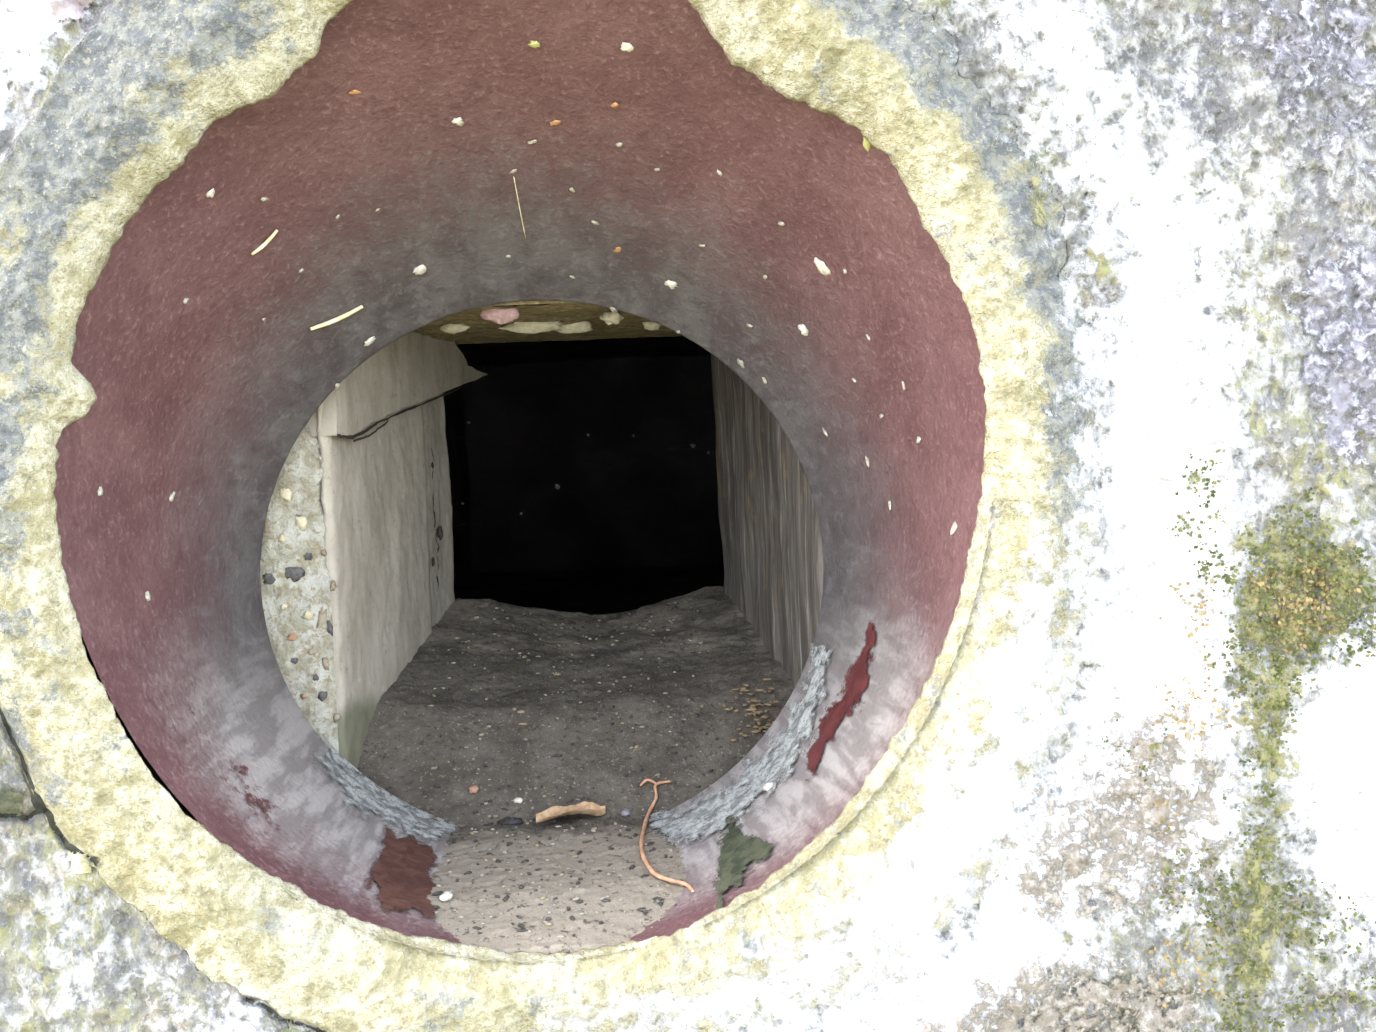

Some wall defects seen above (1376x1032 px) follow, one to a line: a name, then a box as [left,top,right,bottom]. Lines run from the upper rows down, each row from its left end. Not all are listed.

crack [0,708,97,867]